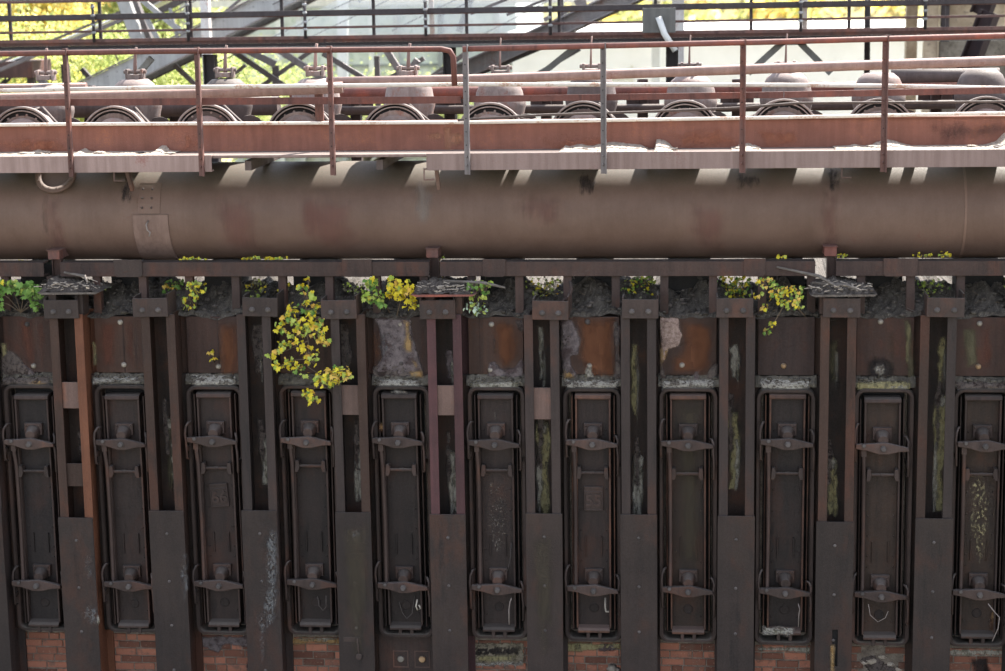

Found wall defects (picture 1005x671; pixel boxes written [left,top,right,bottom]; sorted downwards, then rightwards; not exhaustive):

peeling [373,319,425,385]
peeling [561,320,621,387]
spalling [660,317,682,361]
water stain [933,338,946,509]